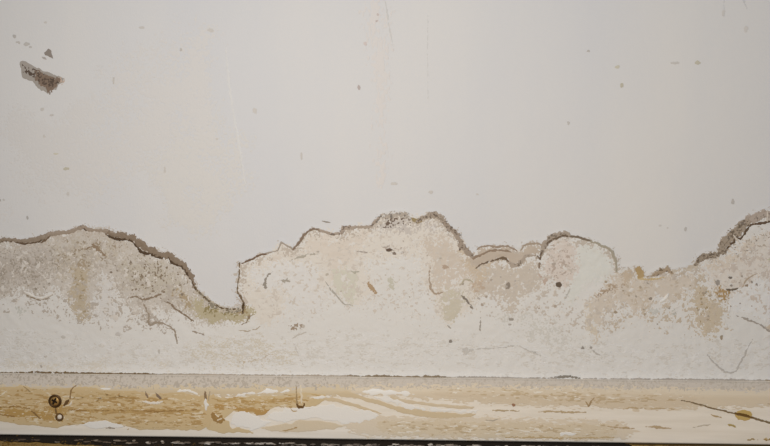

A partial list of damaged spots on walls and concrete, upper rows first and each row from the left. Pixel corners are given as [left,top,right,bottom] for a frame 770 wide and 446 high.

spalling [20,61,64,95]
crack [2,236,50,245]
spalling [0,239,195,329]
crack [128,291,204,344]
crack [80,221,330,332]
leakage [0,207,770,380]
crack [0,315,770,381]
crack [428,214,618,356]
peeling [478,231,770,343]
leakage [0,388,321,430]
leakage [437,388,682,406]